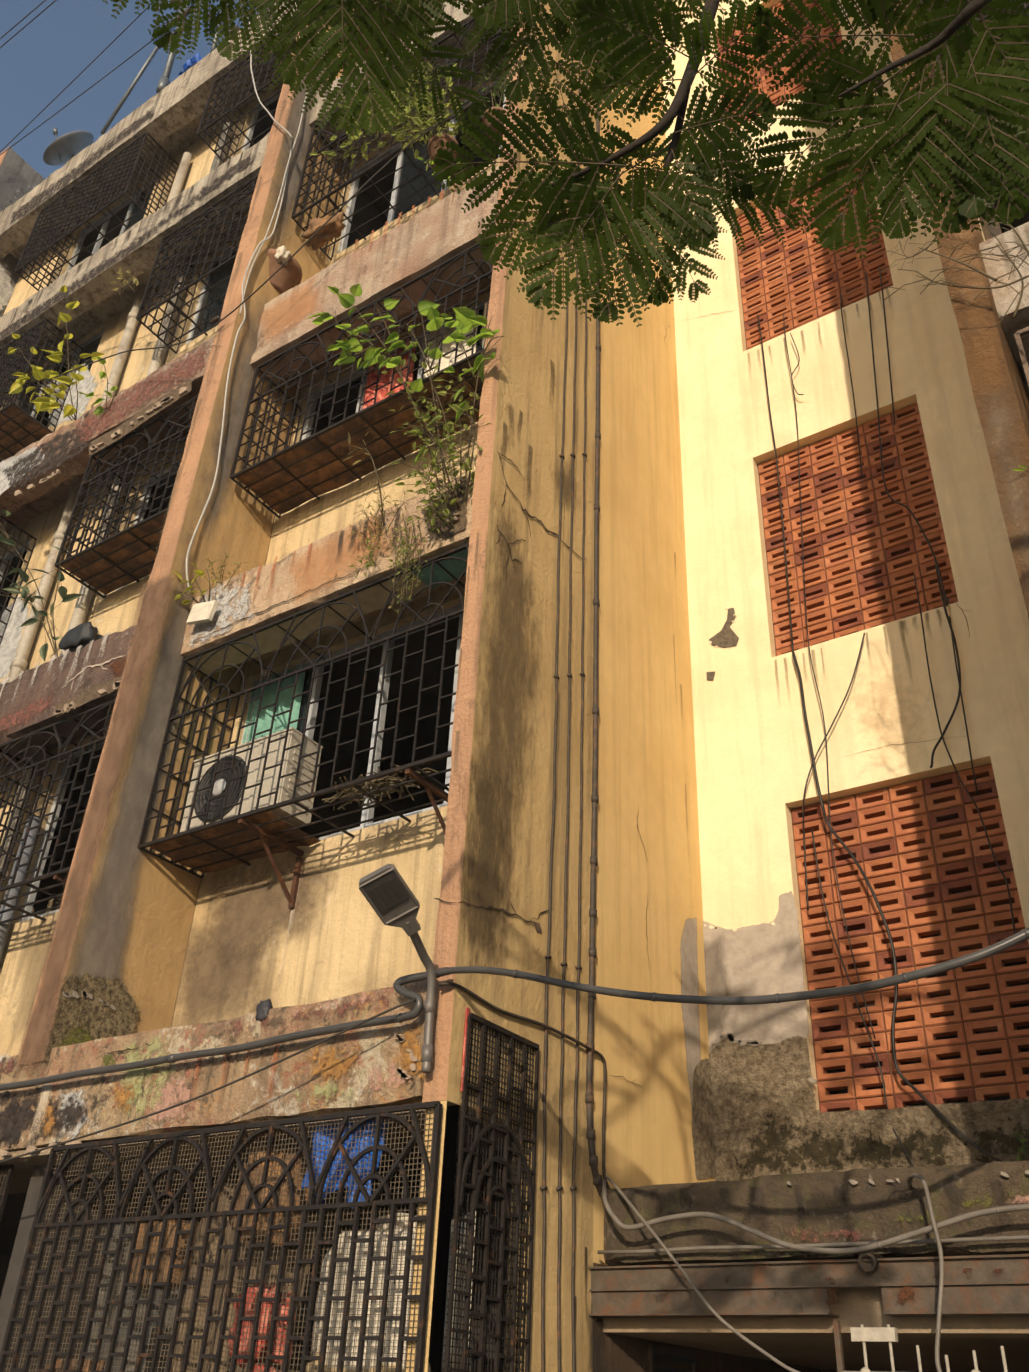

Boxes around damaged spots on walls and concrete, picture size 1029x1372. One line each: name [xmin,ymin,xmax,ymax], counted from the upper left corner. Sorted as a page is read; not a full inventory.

peeling [0,259,14,311]
damp [502,404,523,449]
crack [496,453,587,579]
rust [241,543,312,595]
damp [464,524,535,958]
damp [0,566,254,1070]
crack [433,898,552,928]
damp [0,1083,98,1148]
flaking render [692,1033,1029,1186]